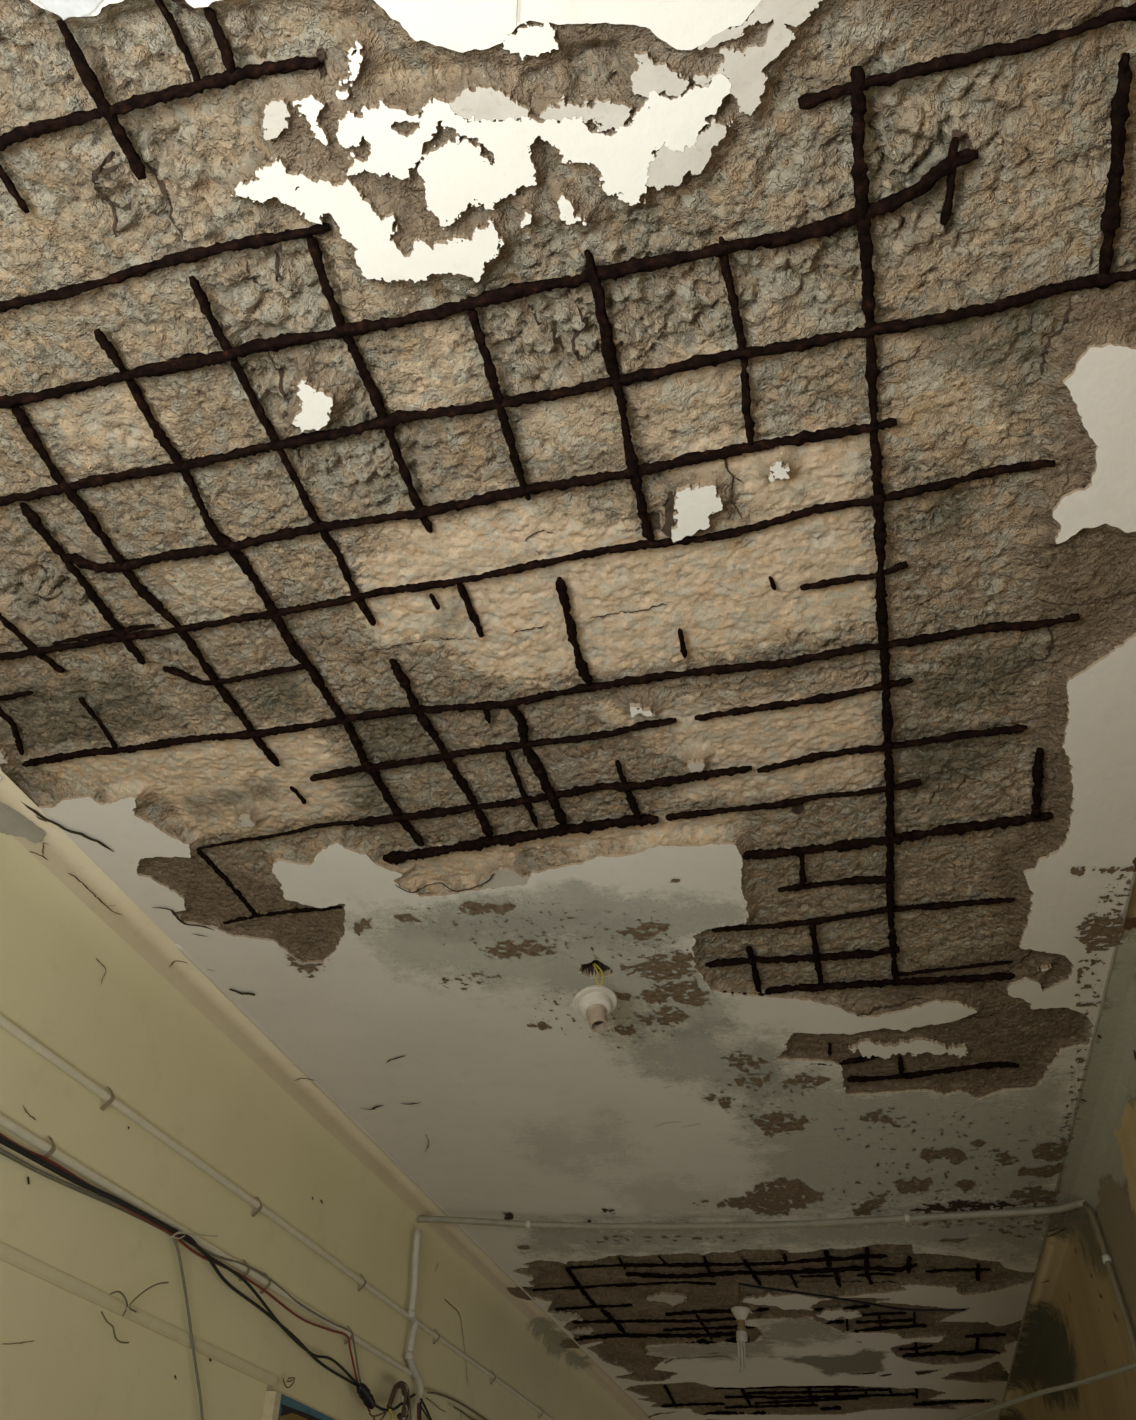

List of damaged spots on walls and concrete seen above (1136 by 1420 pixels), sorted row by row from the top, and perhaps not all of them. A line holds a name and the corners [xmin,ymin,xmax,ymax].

spalling [0,0,1136,324]
corrosion [0,0,1136,996]
spalling [0,224,1136,1216]
corrosion [811,1043,1019,1083]
corrosion [532,1246,991,1345]
spalling [507,1233,1034,1414]
corrosion [660,1384,996,1415]
corrosion [813,1304,1006,1357]